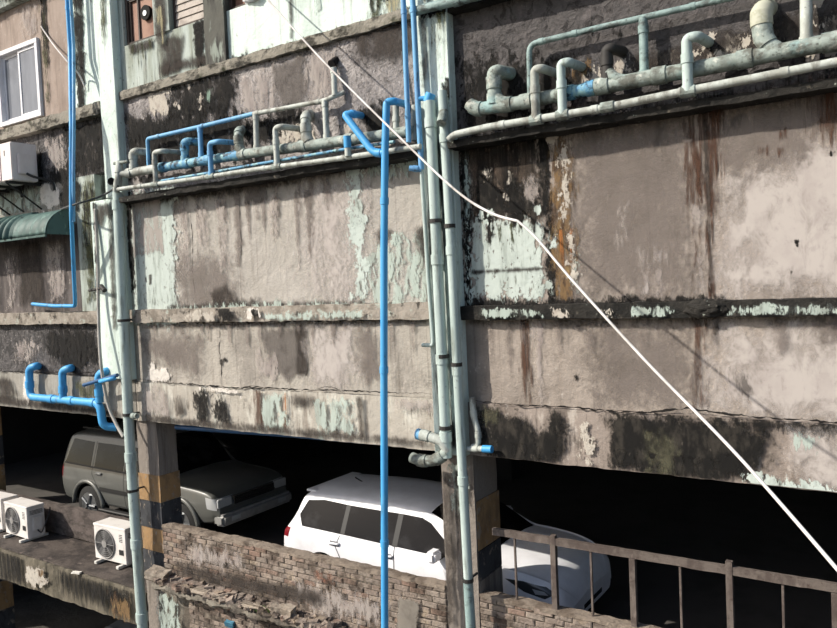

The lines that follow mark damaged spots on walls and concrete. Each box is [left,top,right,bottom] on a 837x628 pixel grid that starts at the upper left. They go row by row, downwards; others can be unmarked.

damp [124,50,308,182]
damp [140,171,378,384]
peeling [127,160,427,330]
crack [141,319,428,394]
peeling [461,159,569,319]
damp [478,406,570,462]
rust [548,136,579,303]
crack [475,400,837,424]
rust [682,109,725,298]
damp [581,317,837,481]
peeling [727,302,837,315]
peeling [742,471,837,492]